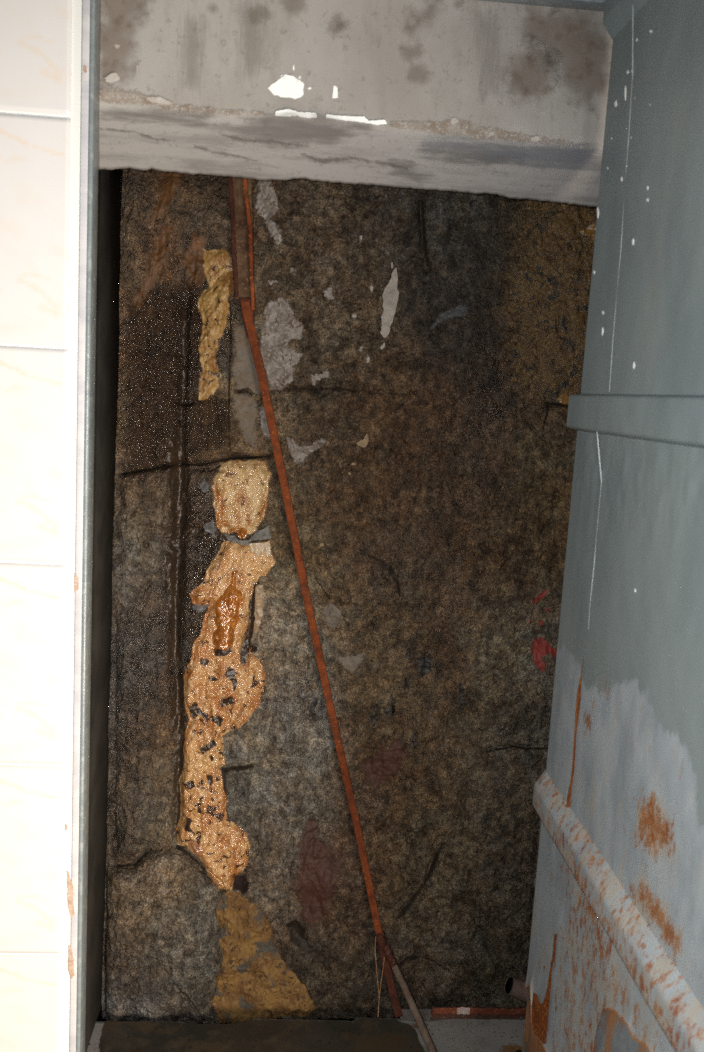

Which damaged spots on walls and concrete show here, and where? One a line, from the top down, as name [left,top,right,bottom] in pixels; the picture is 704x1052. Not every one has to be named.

water stain [513,16,604,95]
water stain [433,306,469,328]
water stain [99,249,425,1052]
corrosion [565,661,591,807]
corrosion [634,791,672,859]